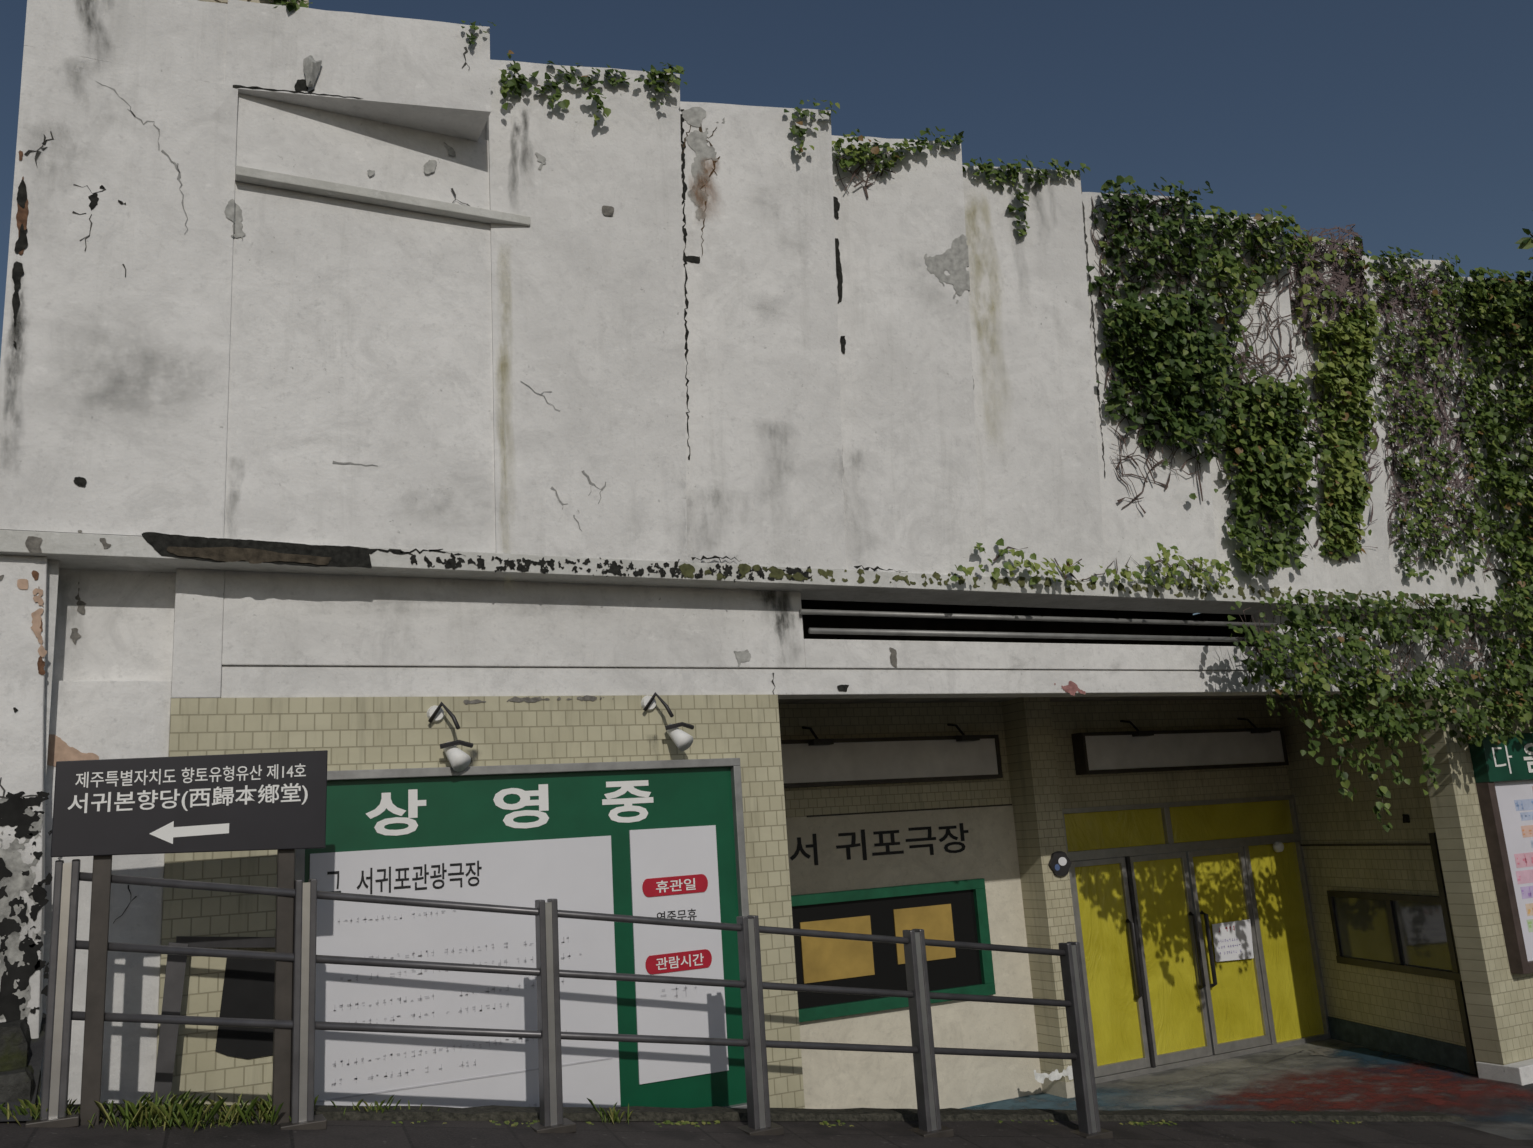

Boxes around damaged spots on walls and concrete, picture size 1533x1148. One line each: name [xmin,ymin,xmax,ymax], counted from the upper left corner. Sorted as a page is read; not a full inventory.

crack [24,131,54,166]
crack [96,81,188,234]
crack [72,184,106,251]
crack [680,109,720,460]
peeling [924,234,970,303]
spalling [142,532,372,568]
peeling [0,531,47,675]
peeling [70,582,86,645]
peeling [47,734,99,766]
peeling [0,791,52,1032]